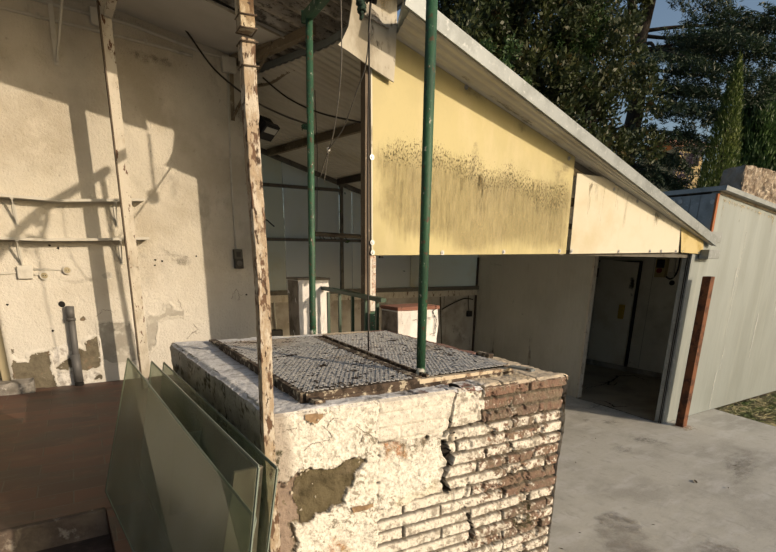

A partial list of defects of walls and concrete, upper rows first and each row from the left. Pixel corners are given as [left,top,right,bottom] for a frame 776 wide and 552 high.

peeling [7,315,138,388]
peeling [144,302,186,354]
crack [440,440,452,491]
flaking render [277,457,374,552]